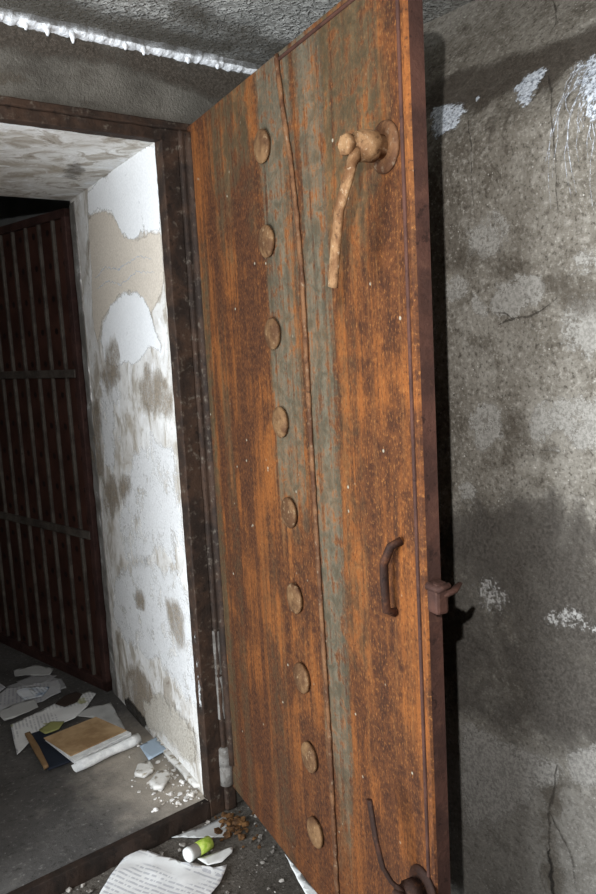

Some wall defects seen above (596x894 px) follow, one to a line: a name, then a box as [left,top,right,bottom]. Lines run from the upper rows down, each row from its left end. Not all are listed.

leakage [0,0,288,99]
leakage [426,26,596,189]
peeling [87,145,164,472]
leakage [439,491,596,752]
crack [547,764,577,894]